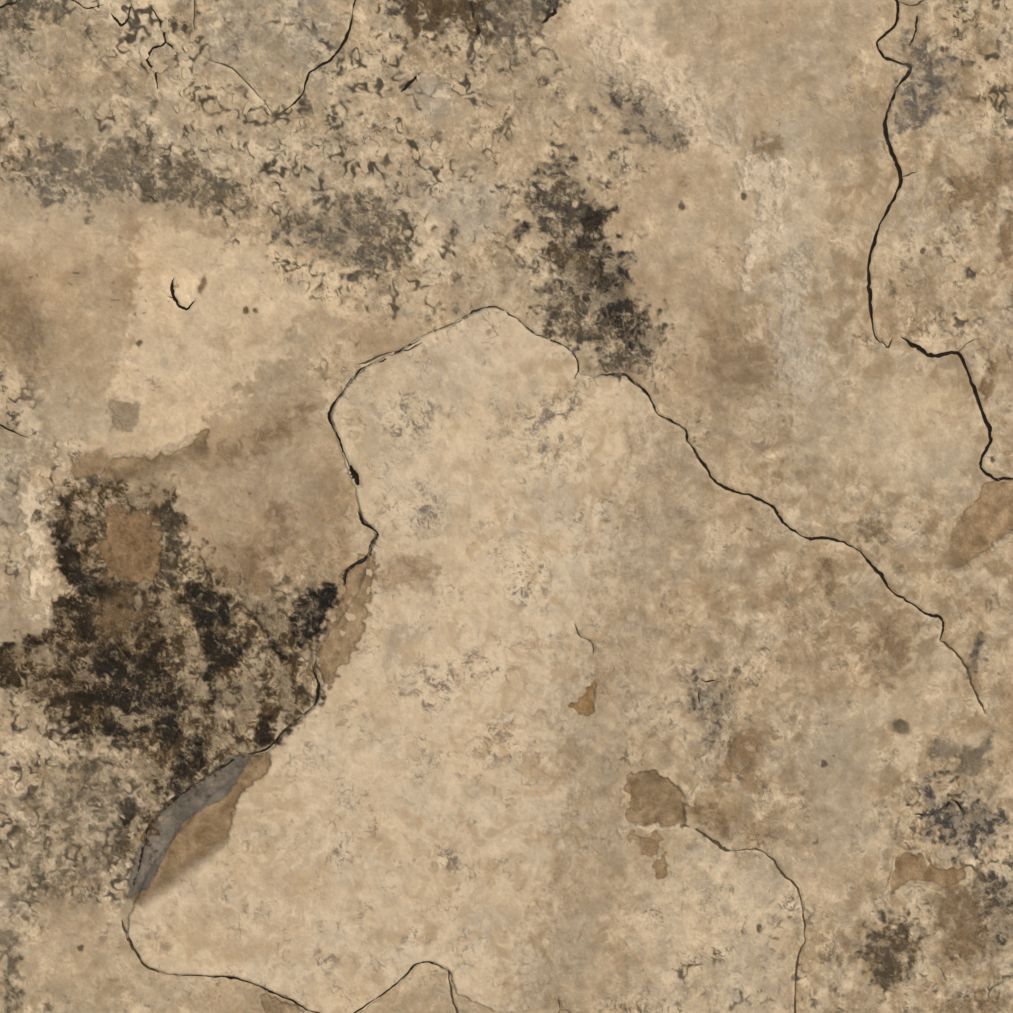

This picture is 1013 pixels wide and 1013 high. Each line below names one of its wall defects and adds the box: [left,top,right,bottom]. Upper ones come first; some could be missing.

crack [206,0,356,117]
water stain [385,0,570,71]
water stain [514,155,668,381]
crack [867,0,1013,482]
crack [327,306,986,714]
flaking render [955,480,1013,568]
water stain [0,449,344,895]
flaking render [126,308,698,1013]
water stain [0,930,25,1013]
crack [121,920,319,1013]
crack [354,961,458,1013]
crack [680,824,806,1013]